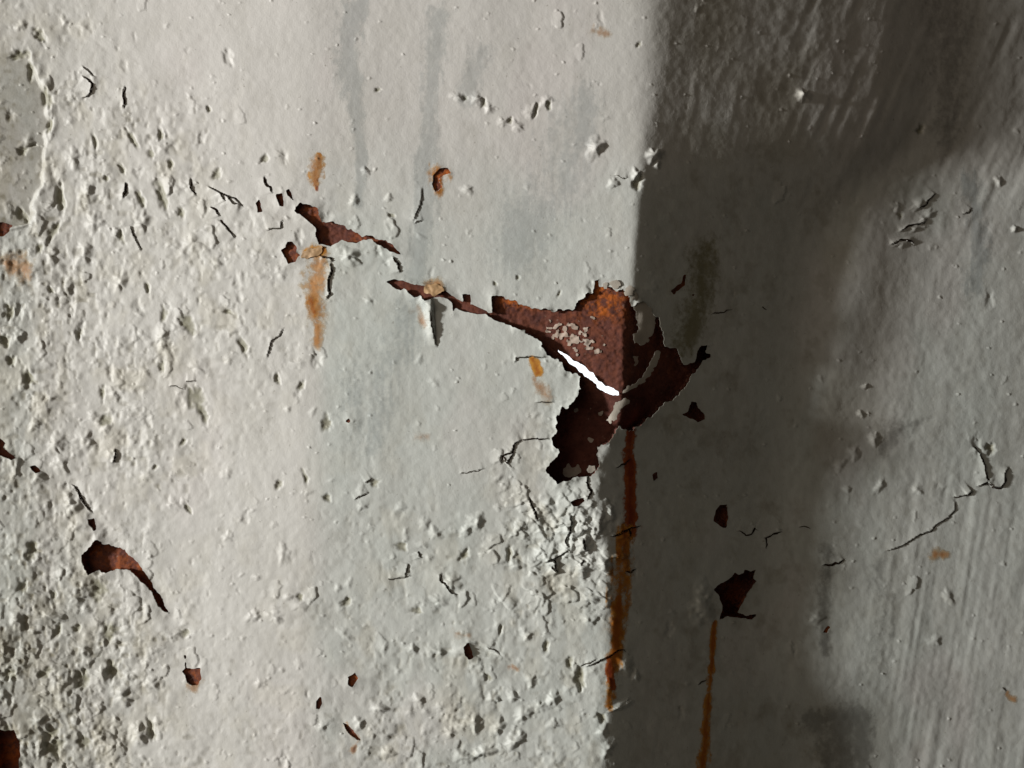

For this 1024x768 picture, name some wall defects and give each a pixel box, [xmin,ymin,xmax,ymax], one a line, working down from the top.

rust [308,153,325,191]
peeling [432,168,451,192]
peeling [282,242,323,264]
rust [300,245,328,349]
peeling [545,316,605,356]
peeling [598,280,661,424]
crack [460,438,549,474]
crack [886,447,1010,551]
rust [605,428,638,711]
peeling [183,655,201,685]
rust [696,620,717,768]
peeling [0,720,21,768]